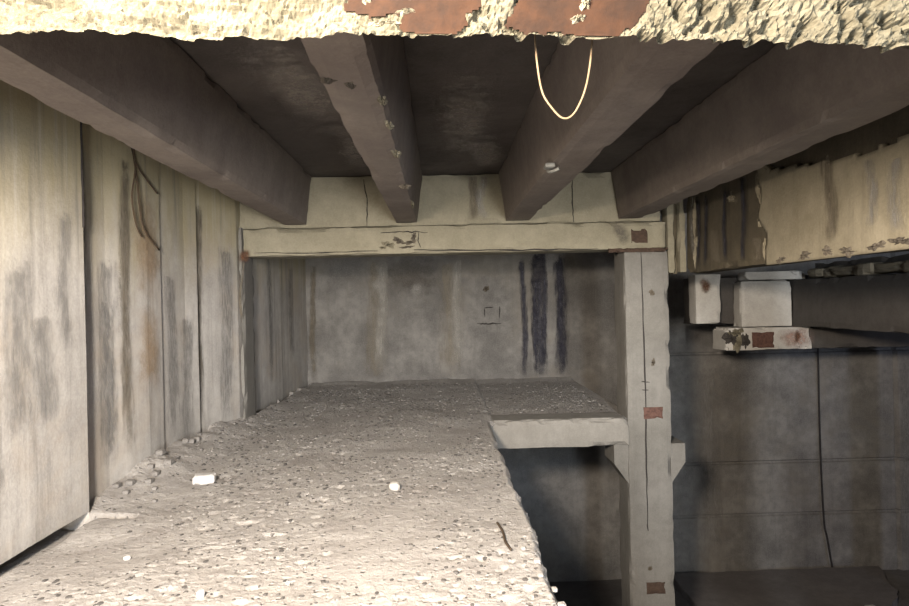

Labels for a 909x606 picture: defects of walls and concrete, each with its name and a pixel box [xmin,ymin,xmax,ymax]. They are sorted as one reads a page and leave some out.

corrosion [344,0,481,34]
corrosion [505,0,649,36]
damp [11,272,52,414]
damp [99,162,131,444]
damp [168,211,203,421]
damp [519,254,567,370]